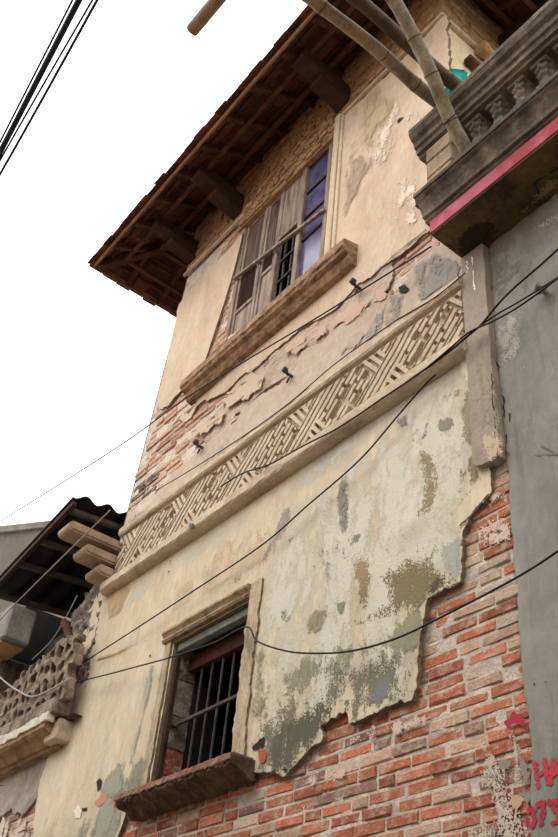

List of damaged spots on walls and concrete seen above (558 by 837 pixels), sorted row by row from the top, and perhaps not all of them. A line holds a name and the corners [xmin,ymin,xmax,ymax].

flaking render [285,234,440,355]
flaking render [128,360,270,523]
flaking render [121,464,535,837]
leakage [249,545,456,775]
spalling [74,779,117,818]